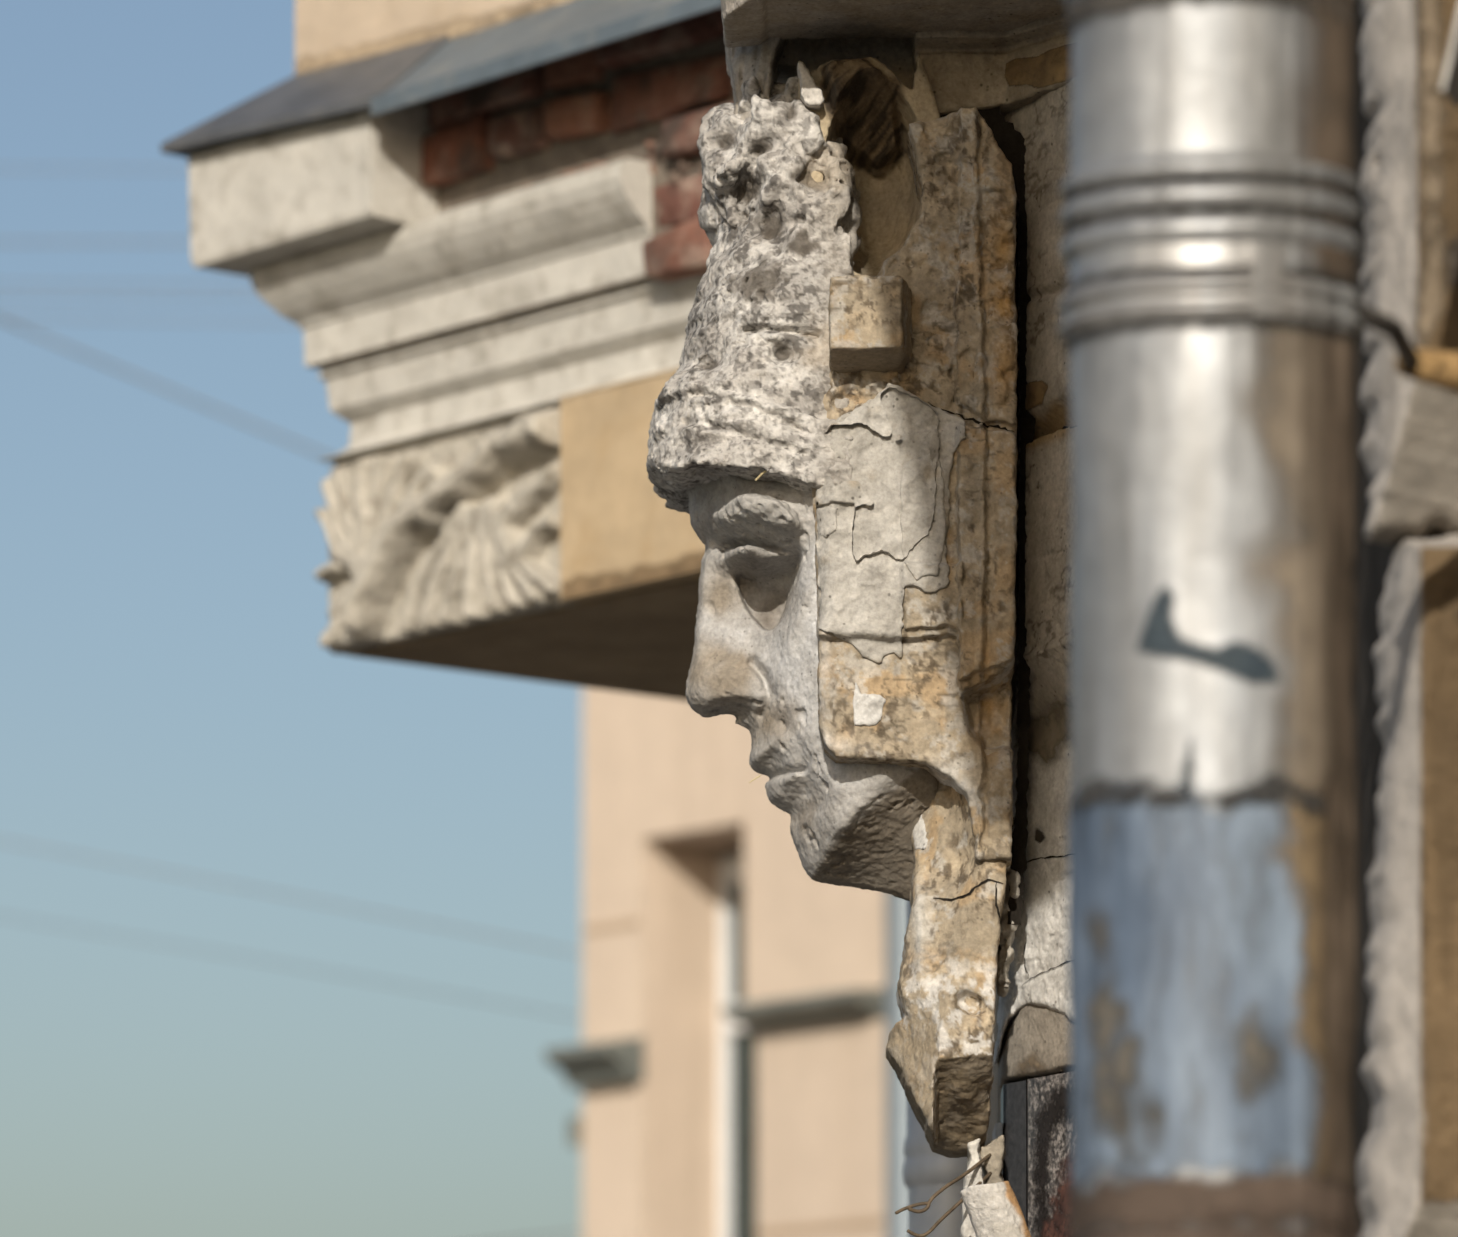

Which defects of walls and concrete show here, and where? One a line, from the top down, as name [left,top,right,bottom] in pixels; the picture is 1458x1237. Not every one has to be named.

flaking render [815,383,966,664]
flaking render [853,682,886,726]
flaking render [913,815,928,850]